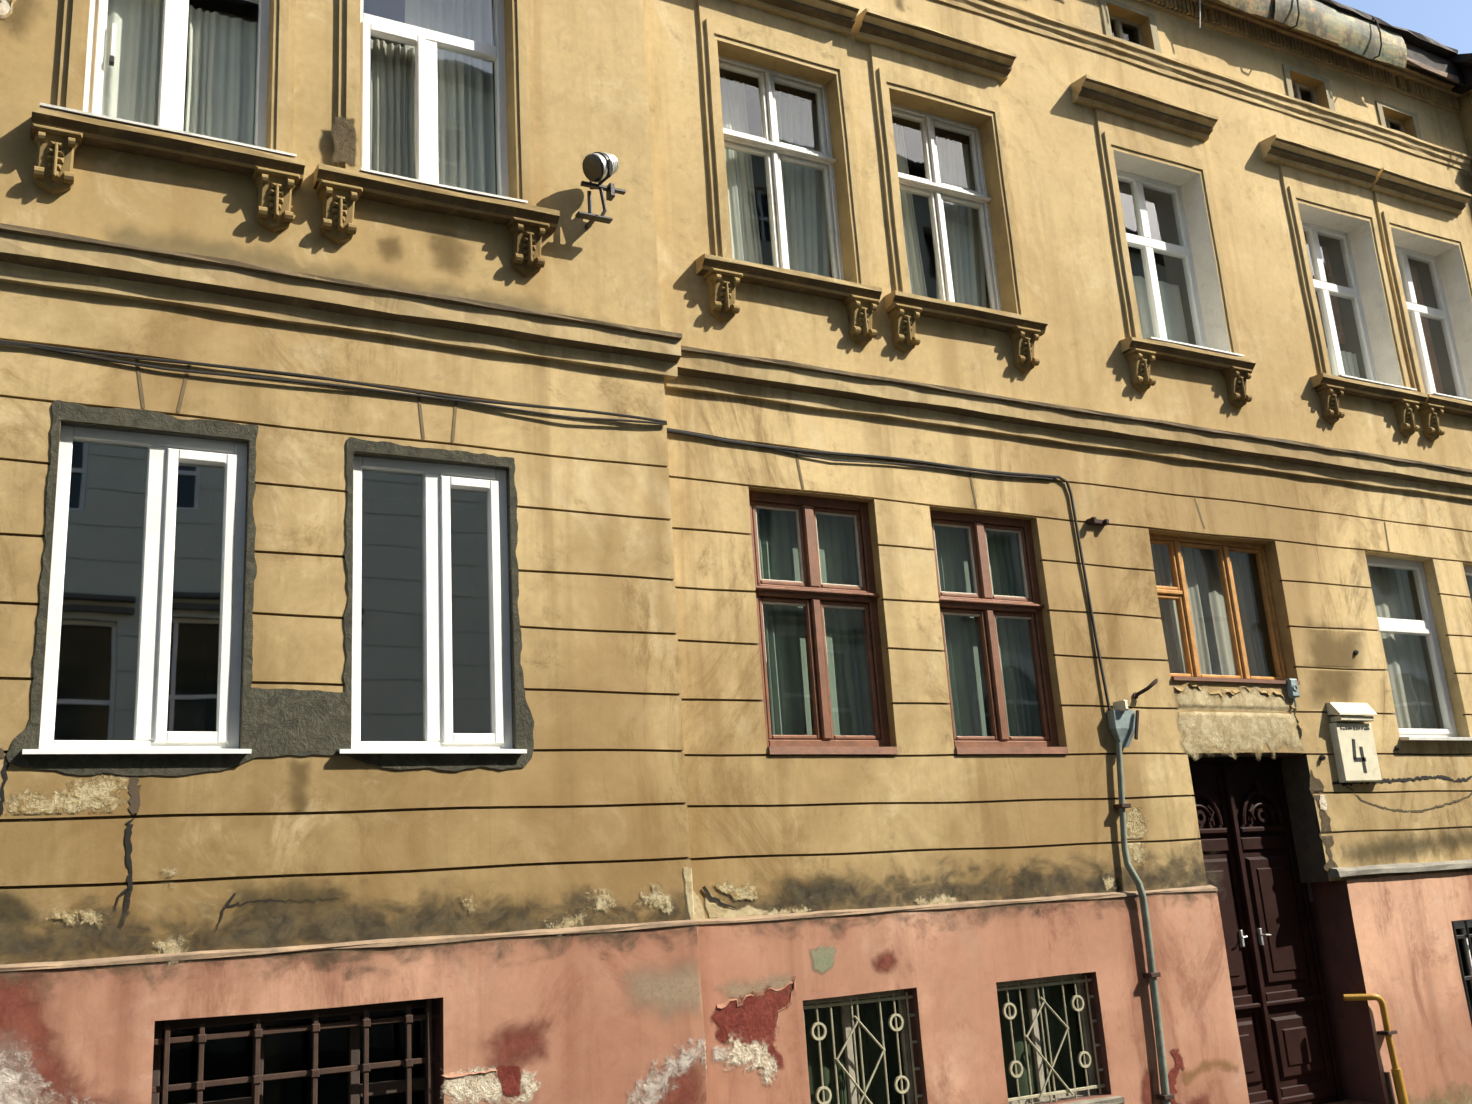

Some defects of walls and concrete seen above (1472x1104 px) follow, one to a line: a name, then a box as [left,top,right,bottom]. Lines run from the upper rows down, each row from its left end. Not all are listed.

flaking render [0,0,17,20]
flaking render [1174,682,1305,757]
crack [0,748,10,815]
crack [115,776,142,928]
leakage [0,884,697,976]
flaking render [683,867,769,920]
leakage [737,858,1218,929]
peeling [0,971,105,1104]
flaking render [442,1025,544,1104]
peeling [712,976,796,1084]